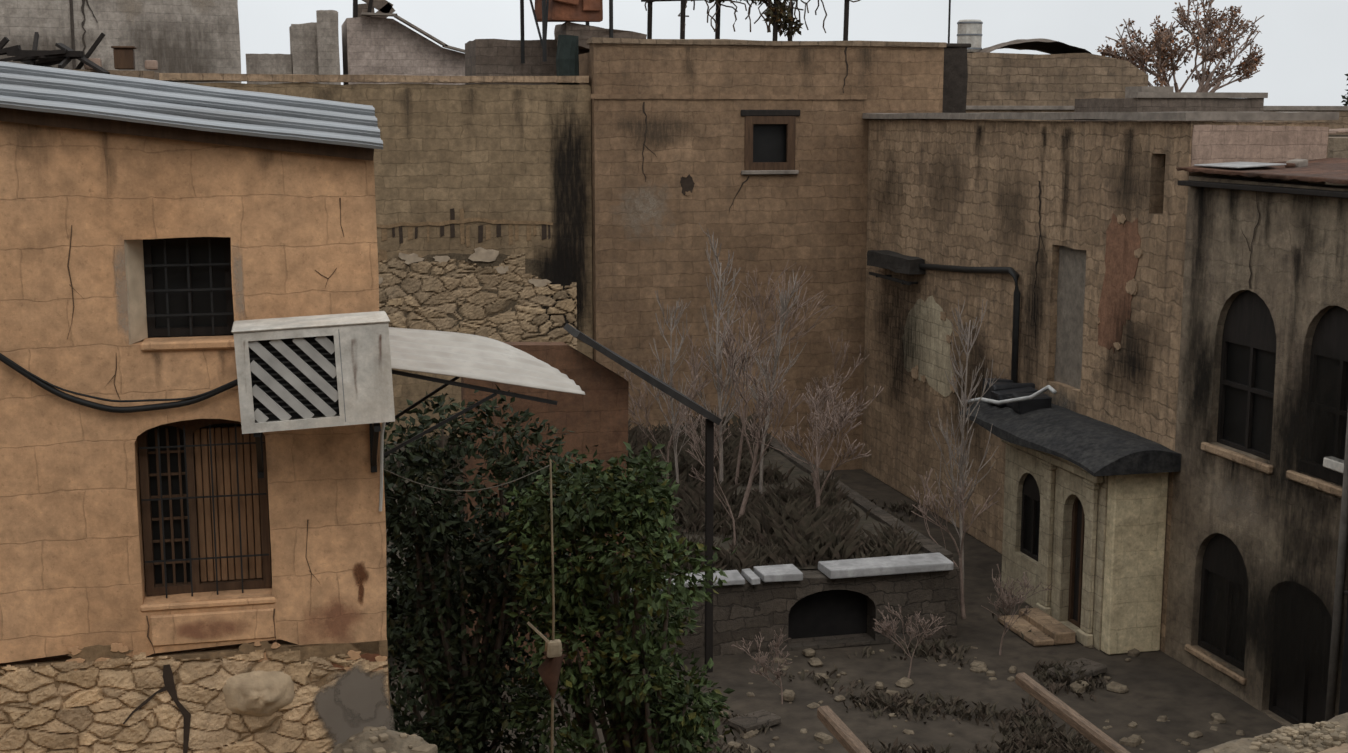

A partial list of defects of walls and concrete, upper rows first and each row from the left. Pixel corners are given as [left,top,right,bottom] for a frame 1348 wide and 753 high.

crack [81,0,98,70]
crack [642,102,657,182]
leakage [540,116,587,331]
leakage [955,349,992,447]